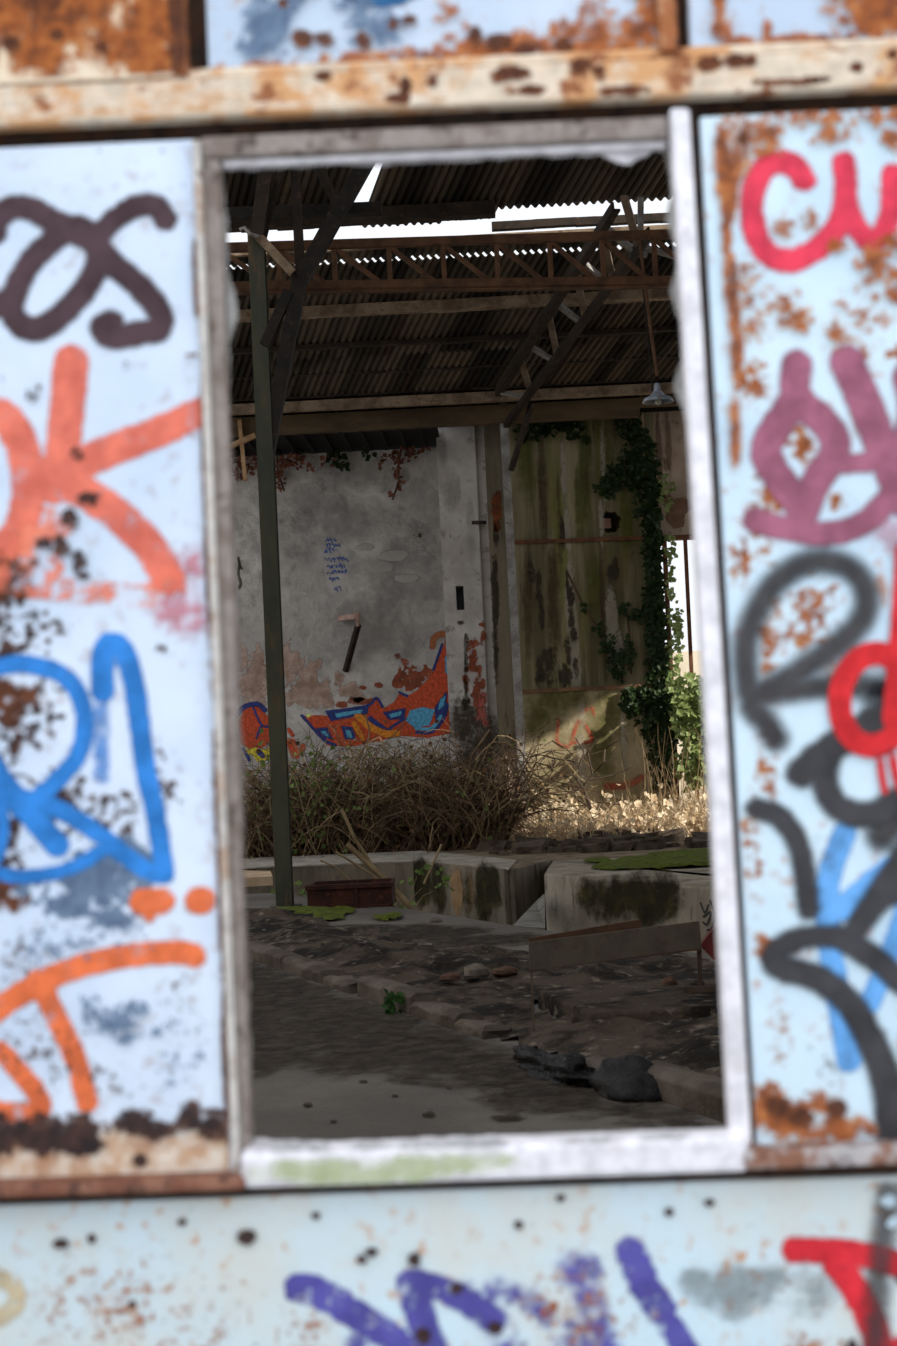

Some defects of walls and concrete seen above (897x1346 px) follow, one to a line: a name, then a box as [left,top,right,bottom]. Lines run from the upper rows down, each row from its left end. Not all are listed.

rust [0,0,658,120]
rust [695,0,897,87]
rust [713,107,897,468]
damp [519,420,611,688]
damp [591,557,620,664]
rust [0,677,37,735]
spalling [239,643,267,711]
spalling [283,643,432,709]
damp [576,868,680,927]
rust [0,729,230,1178]
rust [753,1080,878,1143]
rust [237,1229,257,1246]